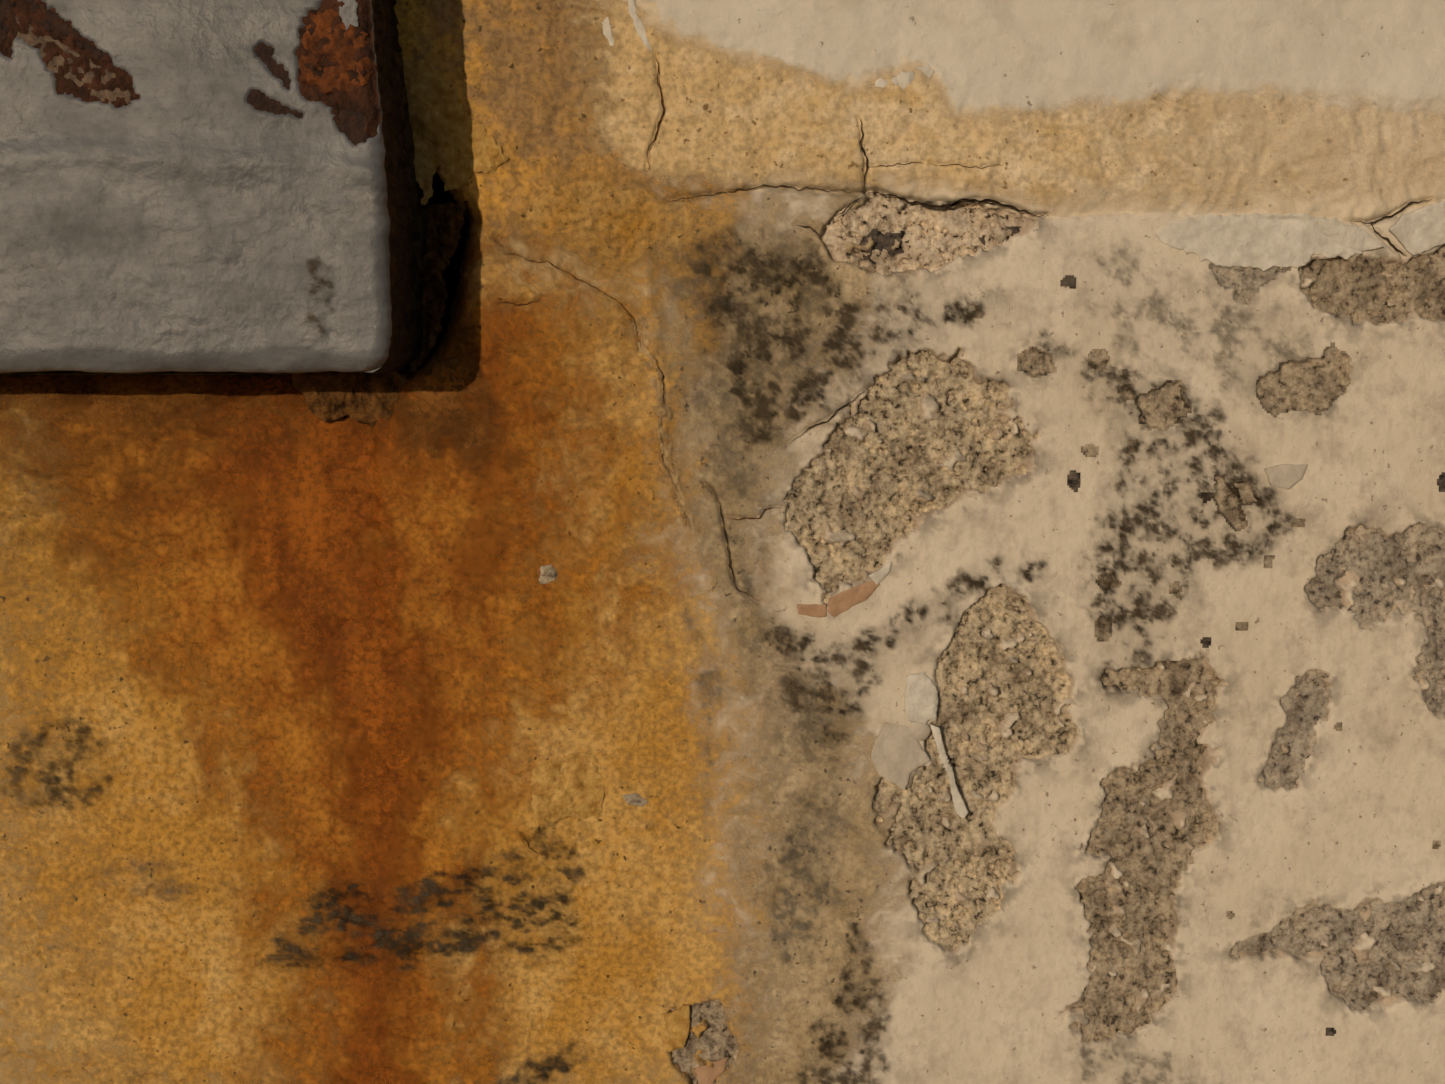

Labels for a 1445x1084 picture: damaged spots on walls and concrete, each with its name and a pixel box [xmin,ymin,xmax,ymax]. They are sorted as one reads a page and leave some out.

corrosion [0,0,649,1084]
crack [489,230,781,603]
crack [647,54,665,169]
crack [790,387,870,443]
crack [666,119,1049,236]
spalling [784,348,1038,618]
water stain [394,0,1445,1084]
spalling [1209,201,1445,324]
water stain [0,396,337,1084]
spalling [871,584,1077,950]
spalling [1069,637,1221,1043]
spalling [1230,882,1445,1011]